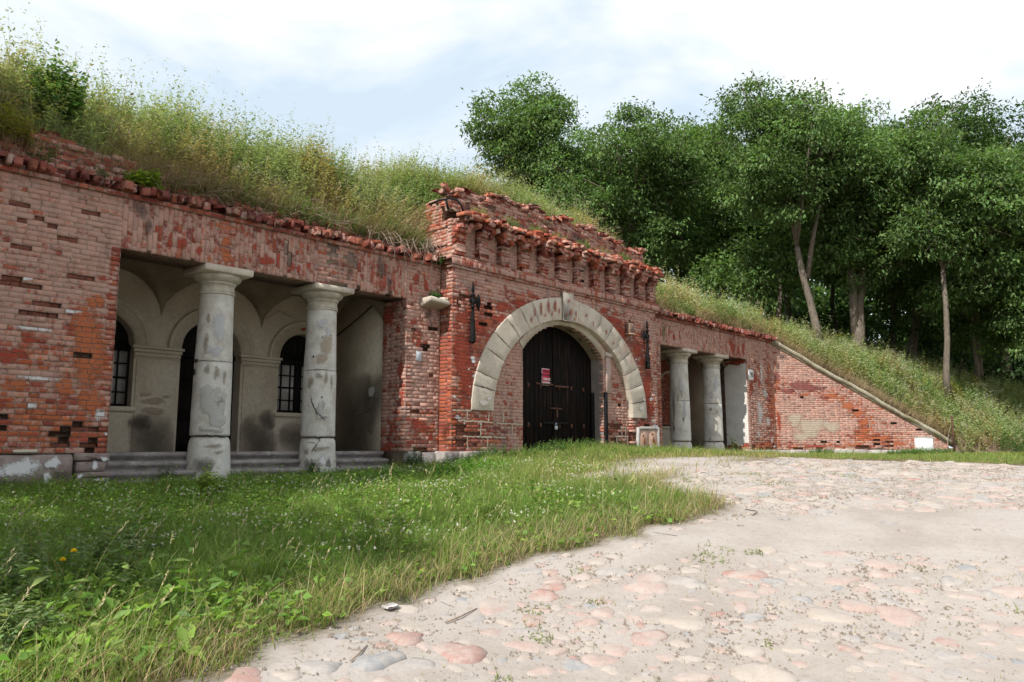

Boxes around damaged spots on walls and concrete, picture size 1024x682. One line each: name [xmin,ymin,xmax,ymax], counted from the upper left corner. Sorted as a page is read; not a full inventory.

peeling [0,274,113,486]
damp [131,419,164,452]
damp [245,414,272,451]
crack [304,398,332,451]